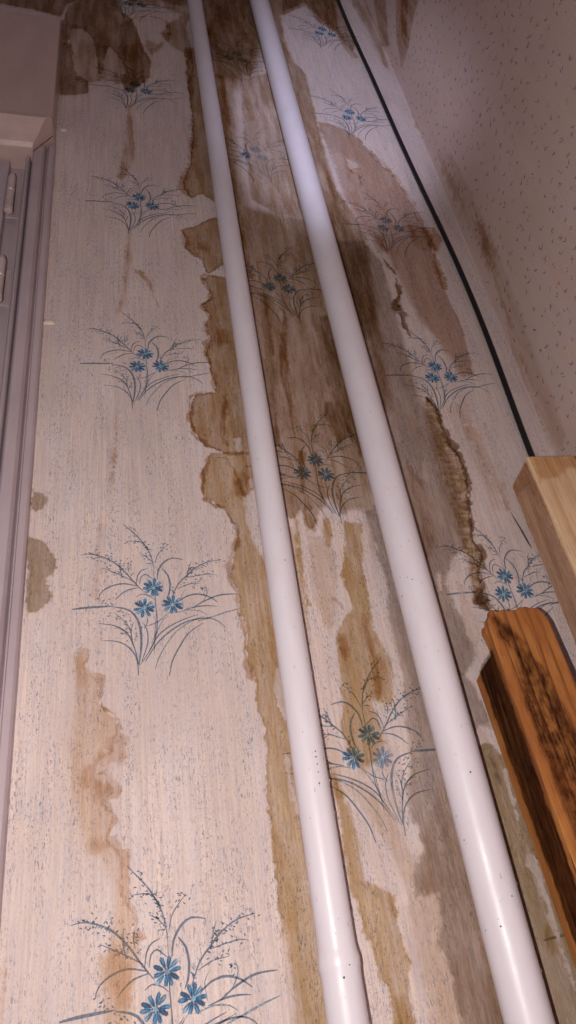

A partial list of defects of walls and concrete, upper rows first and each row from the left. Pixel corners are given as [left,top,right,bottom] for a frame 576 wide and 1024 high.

water stain [9,0,147,88]
water stain [496,619,576,798]
water stain [480,651,576,986]